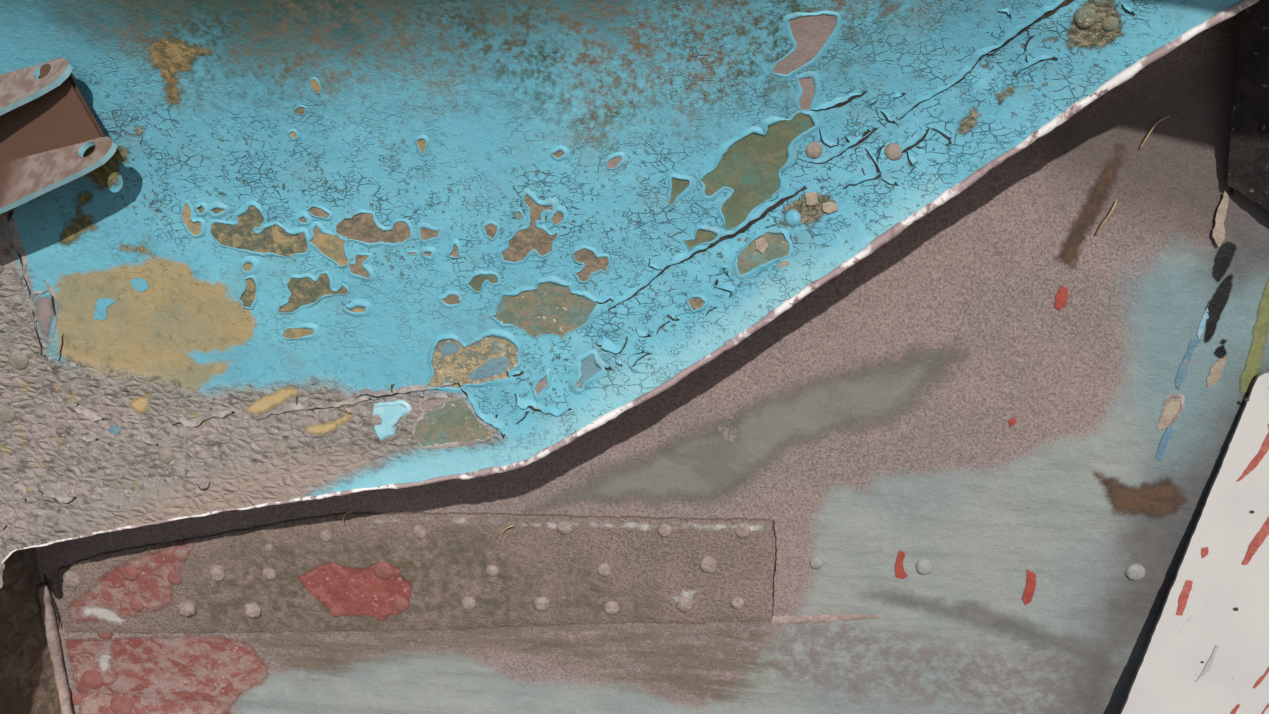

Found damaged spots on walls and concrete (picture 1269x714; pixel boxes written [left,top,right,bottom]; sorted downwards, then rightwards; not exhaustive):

crack [1122,4,1135,15]
peeling [94,298,115,320]
rust [120,244,156,255]
peeling [180,200,464,340]
peeling [372,188,611,450]
peeling [668,11,841,280]
crack [595,0,1074,370]
rust [1060,146,1122,267]
water stain [551,349,956,504]
peeling [70,541,193,622]
peeling [299,562,412,621]
peeling [66,635,268,714]